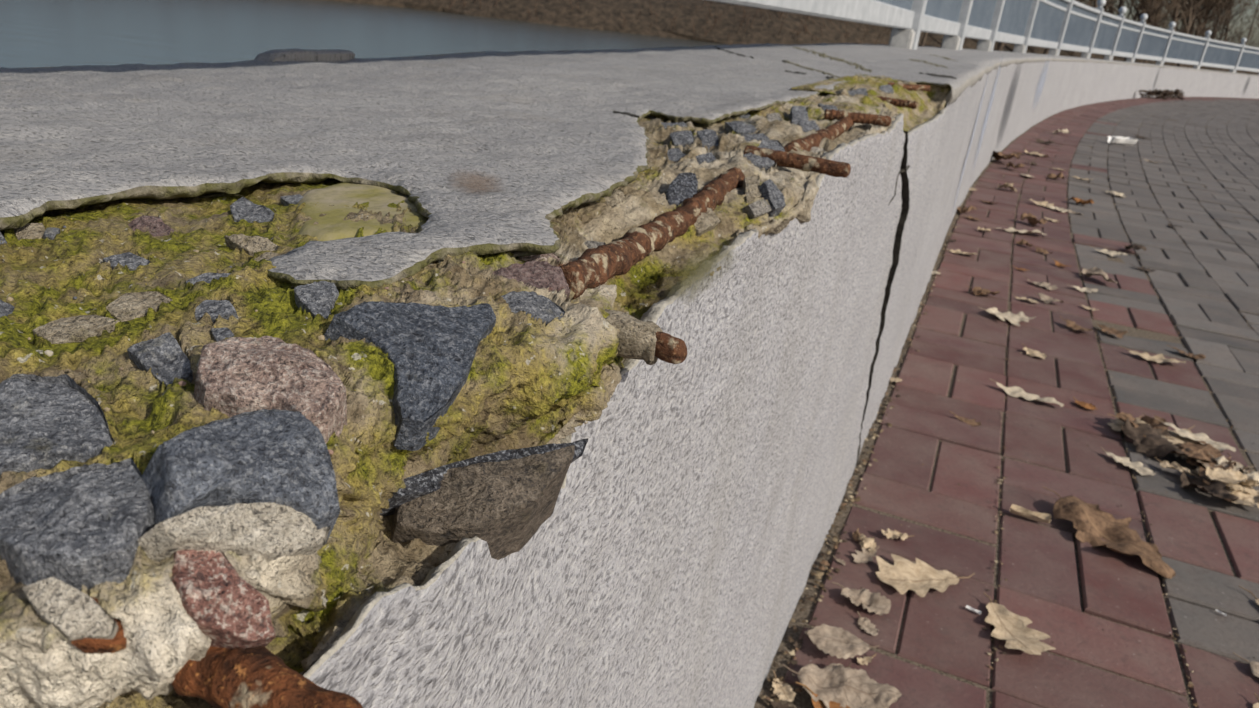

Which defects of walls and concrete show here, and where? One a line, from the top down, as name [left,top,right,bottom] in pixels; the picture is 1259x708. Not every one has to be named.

spalling [0,74,951,708]
crack [856,130,910,466]